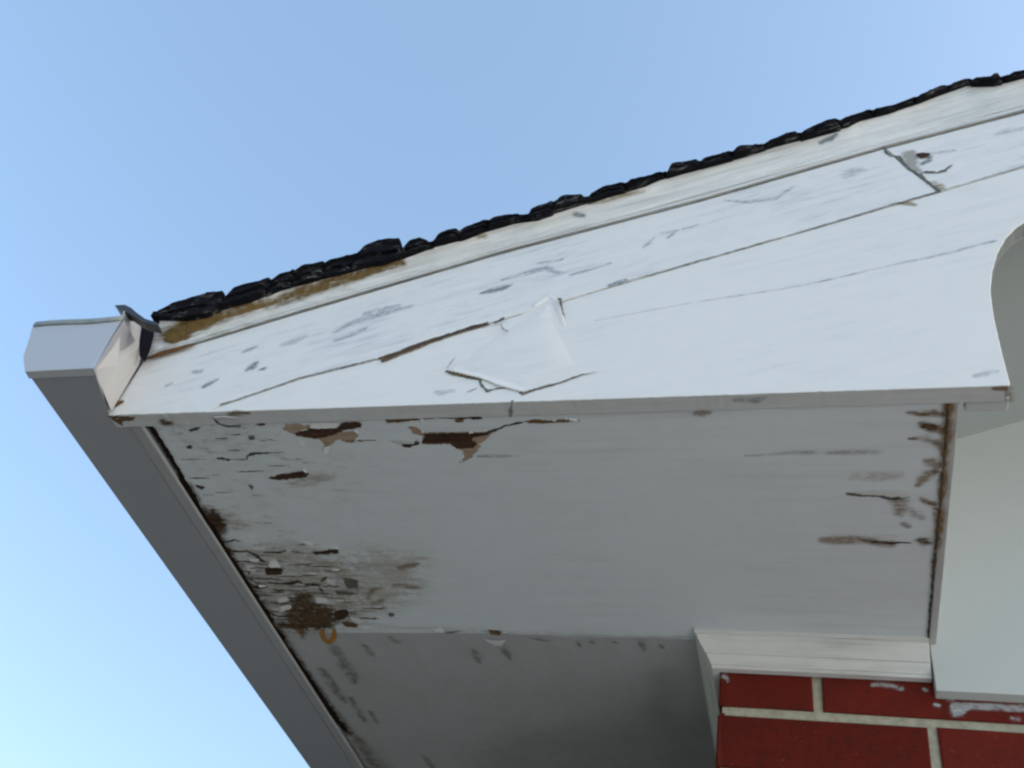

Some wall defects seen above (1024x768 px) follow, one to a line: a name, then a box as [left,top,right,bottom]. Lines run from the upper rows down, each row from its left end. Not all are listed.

crack [627,147,1023,281]
crack [213,358,376,427]
peeling [240,459,308,490]
peeling [282,422,376,454]
peeling [385,417,579,464]
leakage [190,487,353,735]
peeling [236,542,395,630]